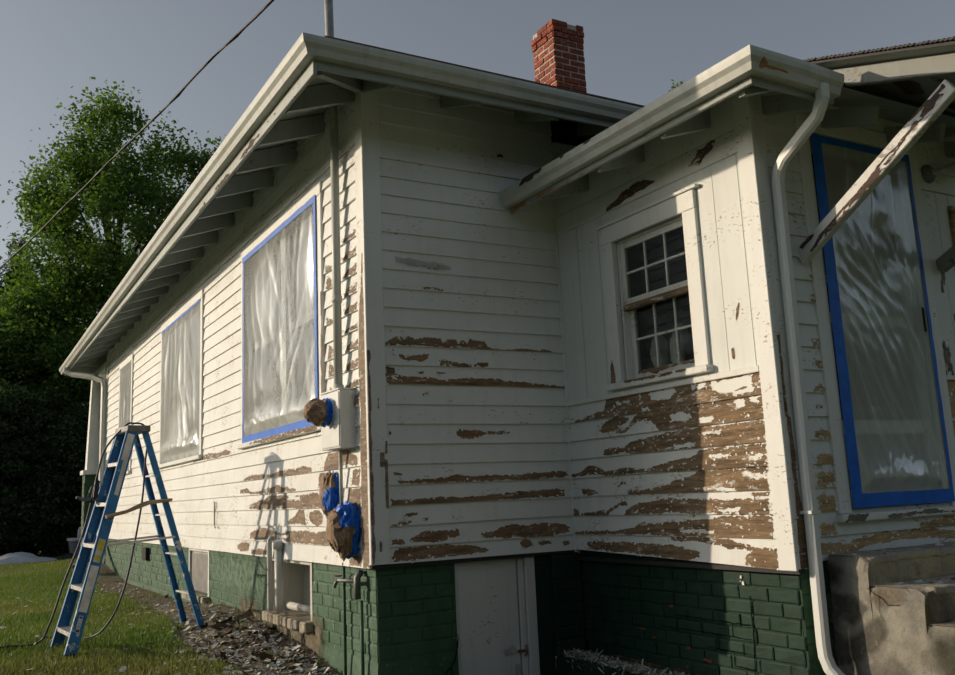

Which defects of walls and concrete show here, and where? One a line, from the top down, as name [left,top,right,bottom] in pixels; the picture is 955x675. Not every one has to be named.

peeling [519,168,541,186]
peeling [606,180,655,212]
peeling [688,140,715,167]
peeling [800,77,955,252]
peeling [193,450,231,463]
peeling [237,229,779,582]
peeling [777,332,809,569]
peeling [815,453,955,556]
peeling [943,340,955,436]